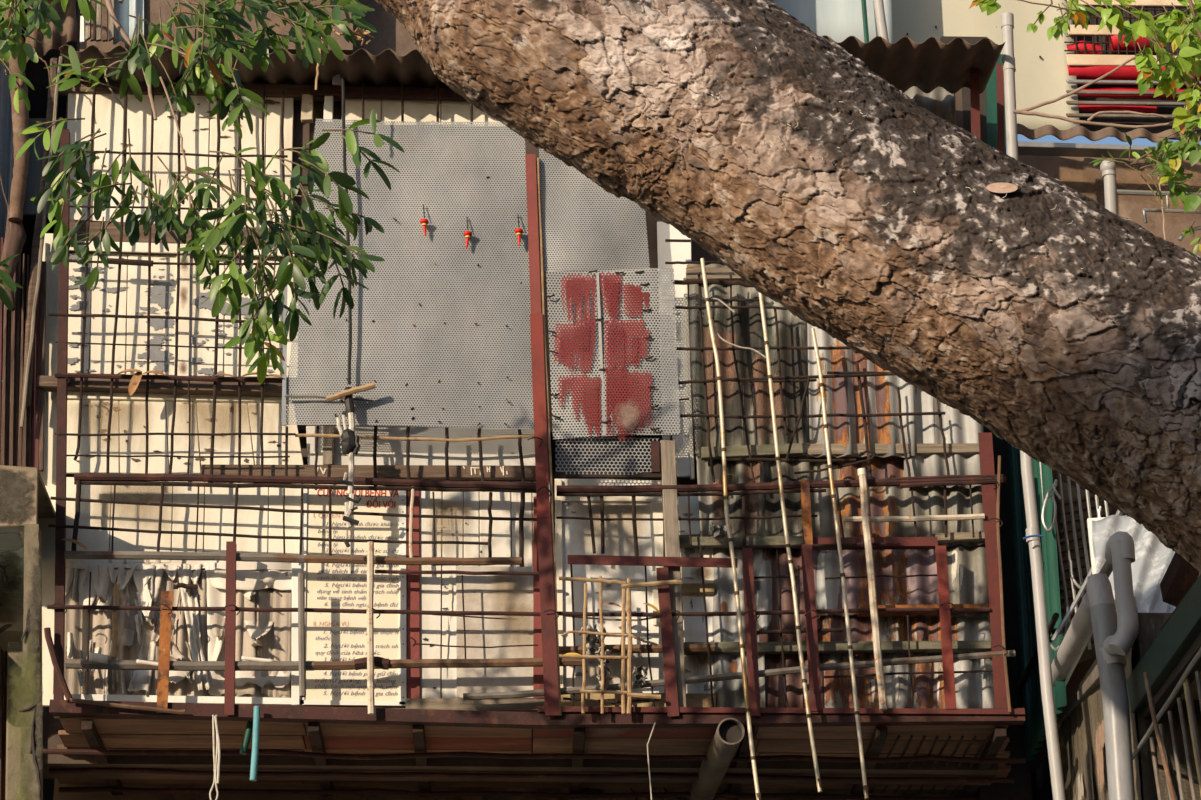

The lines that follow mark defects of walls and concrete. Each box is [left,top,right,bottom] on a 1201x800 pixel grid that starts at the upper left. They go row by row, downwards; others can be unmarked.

peeling [68,332,99,372]
peeling [69,253,128,318]
peeling [136,258,262,375]
water stain [0,469,34,523]
rust [817,339,959,708]
water stain [0,549,43,795]
peeling [65,559,292,697]